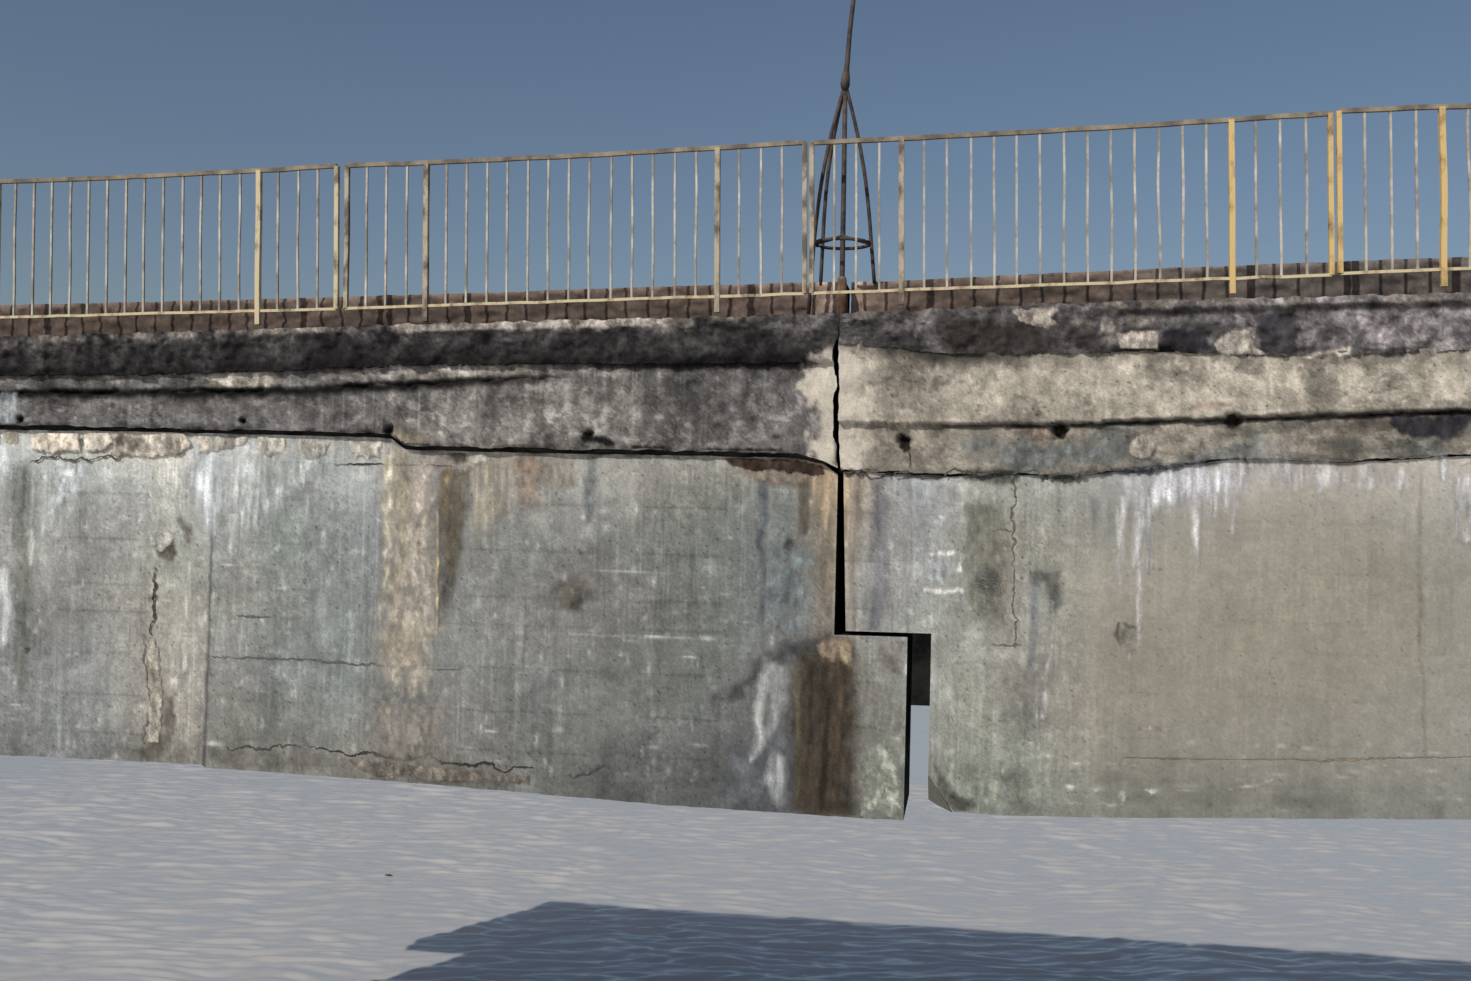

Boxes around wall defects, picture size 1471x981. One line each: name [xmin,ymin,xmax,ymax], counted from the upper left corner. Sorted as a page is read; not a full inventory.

damp [945,319,1096,353]
damp [1162,330,1208,348]
damp [1258,313,1298,356]
damp [1363,348,1404,356]
spalling [4,431,329,462]
peeling [350,441,381,459]
damp [1359,413,1471,540]
rust [435,453,466,634]
damp [1119,437,1403,624]
damp [0,563,26,661]
rust [795,640,855,812]